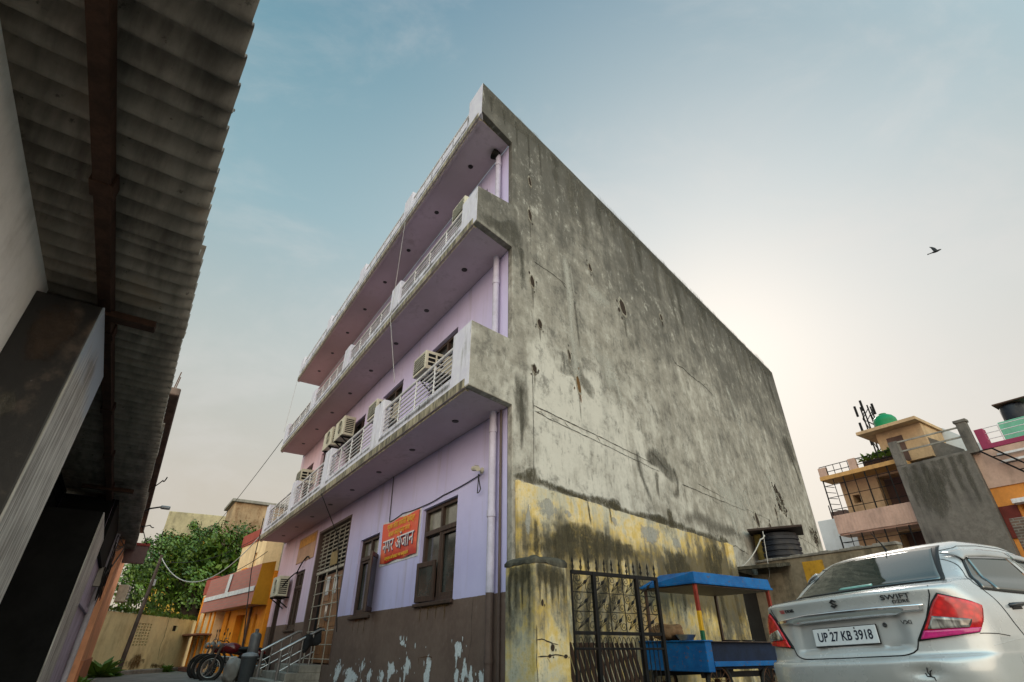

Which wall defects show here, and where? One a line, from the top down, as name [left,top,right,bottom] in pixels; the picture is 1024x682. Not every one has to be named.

leakage [637,451,679,495]
leakage [508,468,753,659]
peeling [330,637,431,682]
peeling [454,636,484,682]